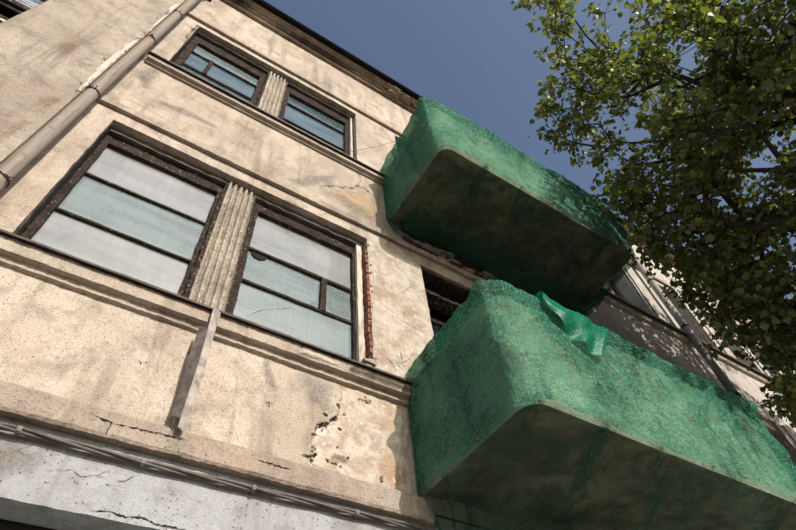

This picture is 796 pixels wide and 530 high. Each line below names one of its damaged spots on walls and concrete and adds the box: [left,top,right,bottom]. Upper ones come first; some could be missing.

flaking render [79,2,181,91]
crack [91,413,190,441]
spalling [306,384,410,494]
crack [91,510,186,530]